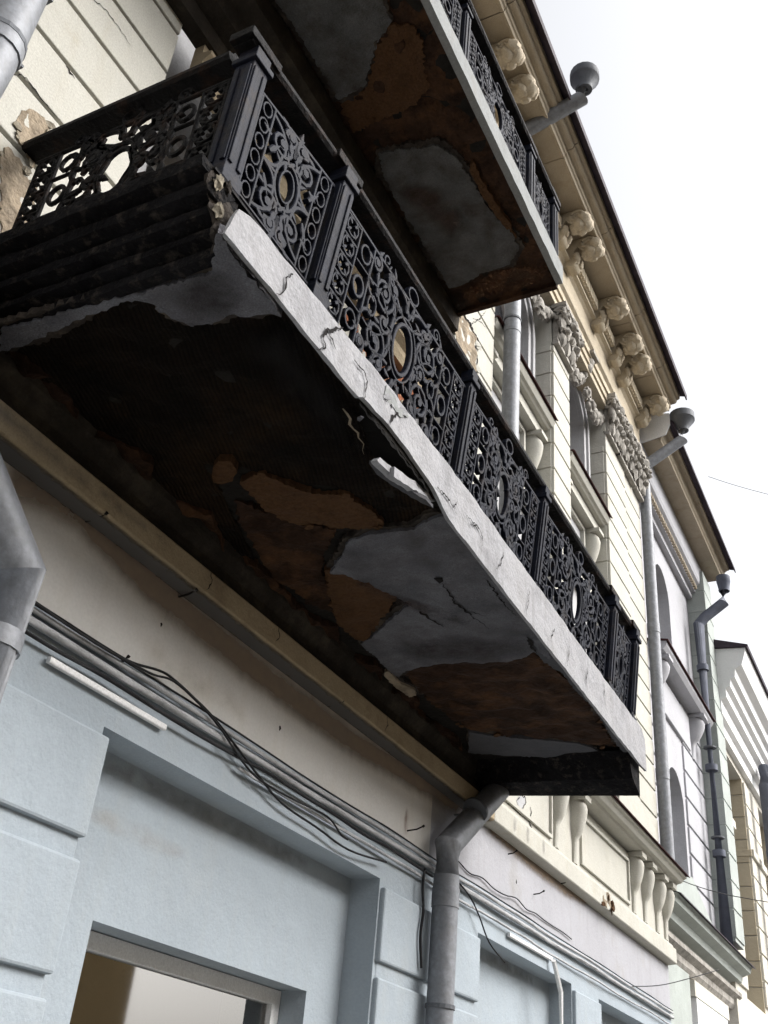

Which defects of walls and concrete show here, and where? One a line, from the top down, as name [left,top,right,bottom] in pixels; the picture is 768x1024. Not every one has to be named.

spalling [0,108,56,233]
spalling [204,166,234,245]
peeling [288,0,555,373]
crack [317,326,368,399]
spalling [17,301,435,641]
crack [405,488,605,694]
peeling [406,652,616,749]